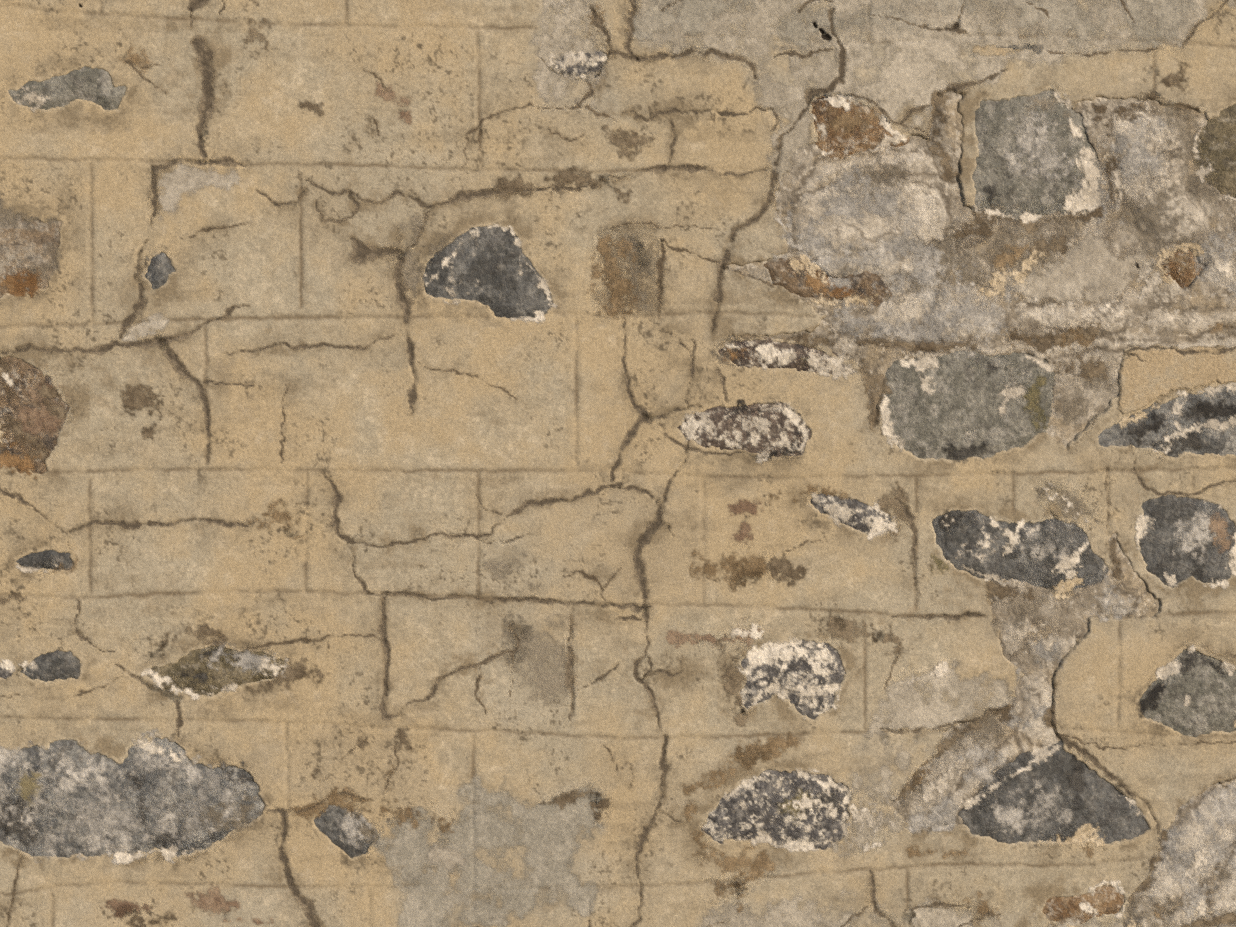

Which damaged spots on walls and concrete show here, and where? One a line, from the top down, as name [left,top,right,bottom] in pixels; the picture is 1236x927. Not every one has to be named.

crack [1,0,254,462]
spalling [422,224,557,323]
spalling [633,0,1236,463]
spalling [0,356,69,475]
crack [0,489,249,548]
crack [227,0,1007,927]
crack [1120,346,1236,361]
spalling [0,649,81,682]
crack [74,599,184,736]
spalling [701,493,1236,927]
spalling [0,730,265,864]
crack [1054,729,1160,834]